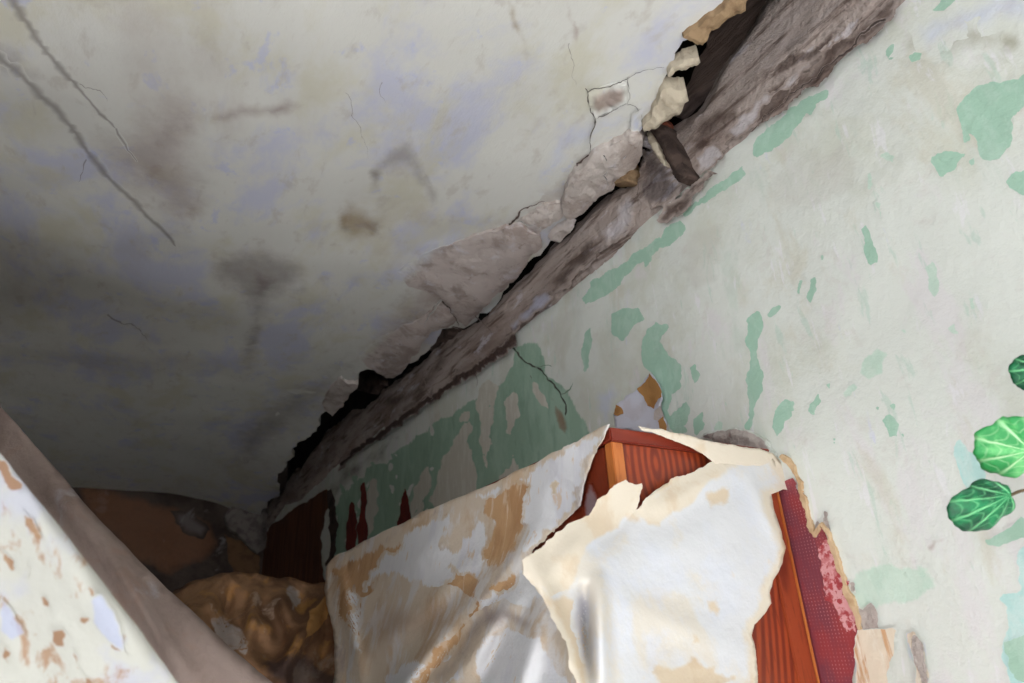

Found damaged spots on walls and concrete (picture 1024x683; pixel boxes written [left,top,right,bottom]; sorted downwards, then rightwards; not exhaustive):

crack [0,0,176,246]
damp [73,70,316,376]
damp [328,134,443,248]
crack [566,43,664,186]
peeling [577,85,832,306]
peeling [930,74,1024,179]
damp [222,281,444,479]
crack [340,299,573,466]
damp [405,284,509,368]
peeling [329,335,592,556]
peeling [610,307,724,437]
spalling [779,454,940,683]